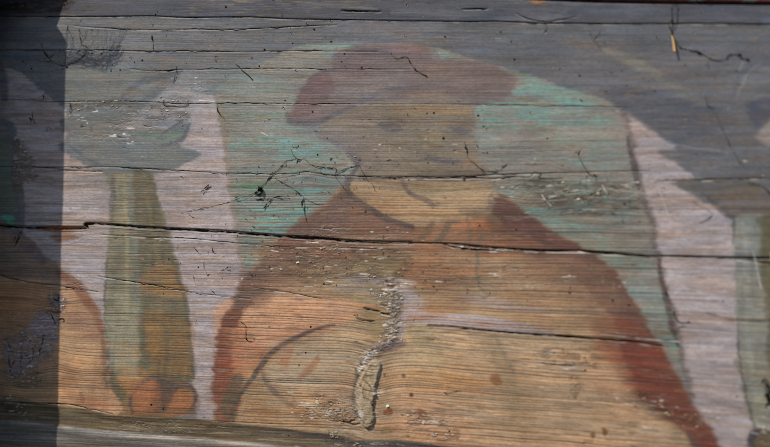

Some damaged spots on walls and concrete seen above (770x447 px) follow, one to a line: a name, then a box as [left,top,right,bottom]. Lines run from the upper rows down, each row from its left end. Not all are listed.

crack [33,166,587,179]
crack [0,223,770,264]
crack [762,382,770,406]